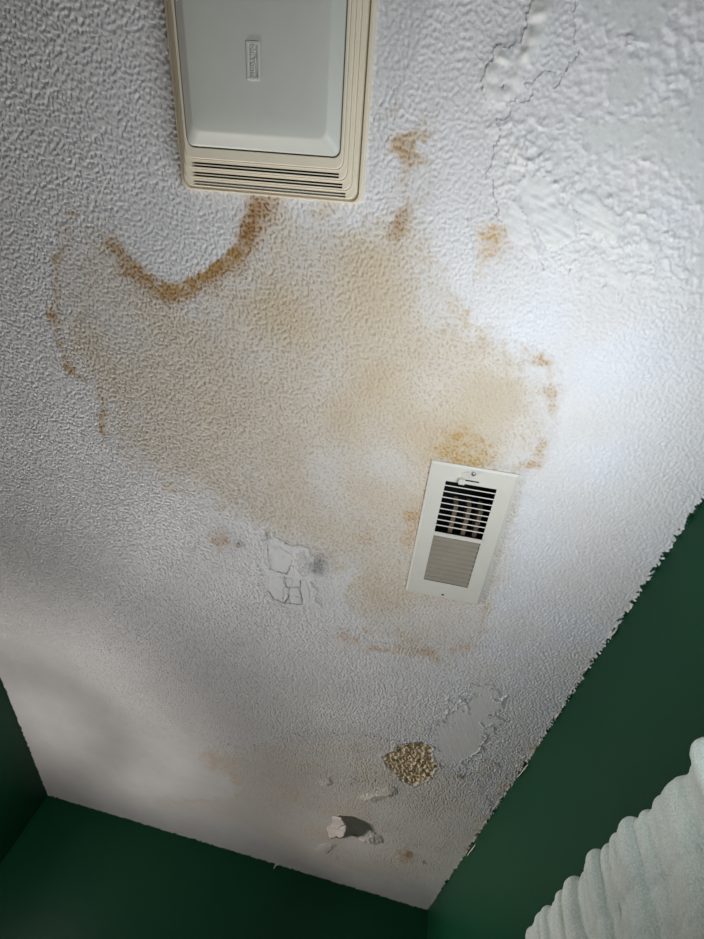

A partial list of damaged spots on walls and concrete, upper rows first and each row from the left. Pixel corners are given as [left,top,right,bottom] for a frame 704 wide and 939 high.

damp [43,109,568,666]
spalling [381,742,443,788]